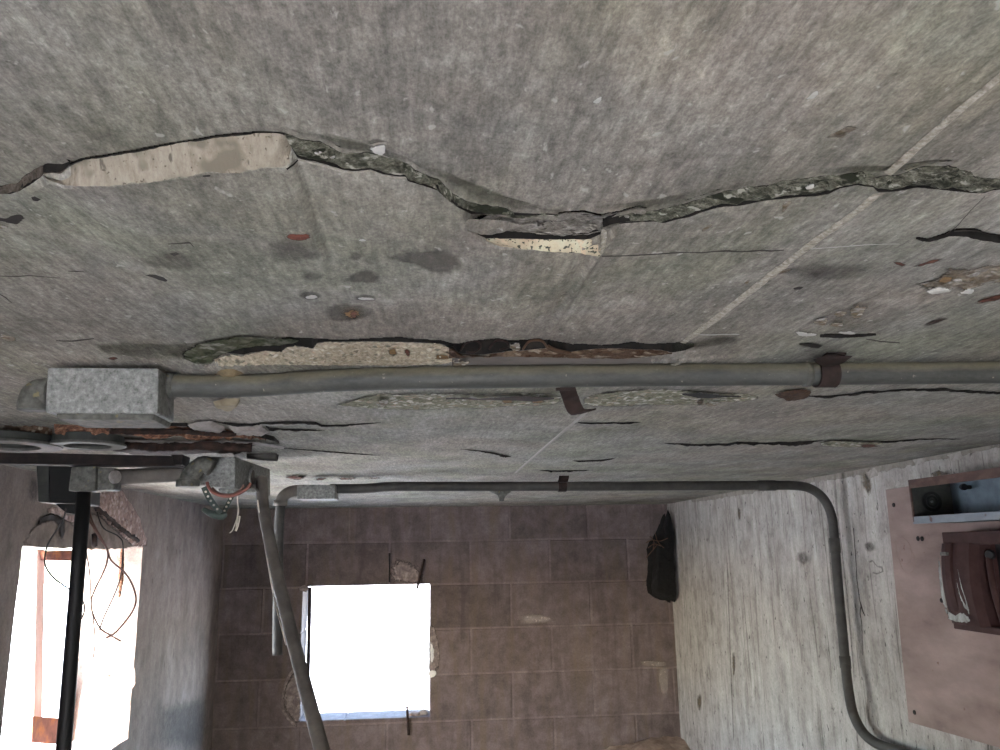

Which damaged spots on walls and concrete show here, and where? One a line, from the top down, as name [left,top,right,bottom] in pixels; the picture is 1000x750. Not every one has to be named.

spalling [43,133,298,186]
crack [0,126,1000,257]
spalling [485,229,607,256]
spalling [920,265,1000,294]
spalling [104,334,740,367]
spalling [338,393,561,410]
spalling [584,389,757,407]
crack [797,388,1000,402]
crack [214,421,382,457]
crack [459,449,511,458]
crack [661,439,823,447]
crack [881,436,960,444]